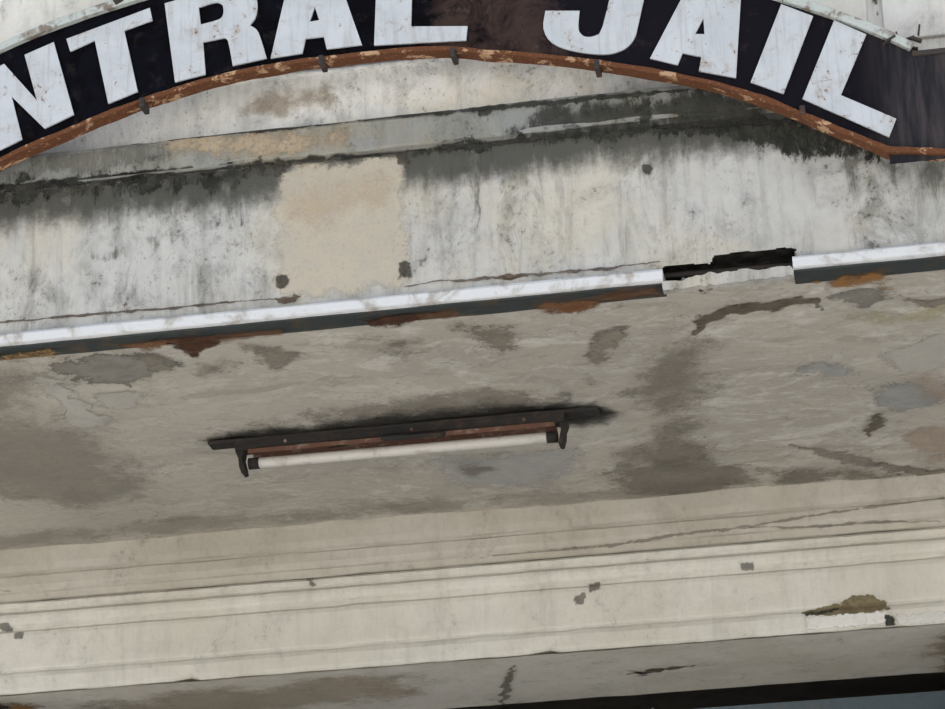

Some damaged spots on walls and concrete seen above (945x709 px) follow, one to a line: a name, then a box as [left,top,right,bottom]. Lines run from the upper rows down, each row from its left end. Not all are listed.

rust [253,86,330,115]
rust [159,122,351,157]
spalling [662,248,795,294]
rust [363,311,456,327]
rust [532,289,660,315]
peeling [692,288,945,335]
rust [119,329,281,358]
leakage [585,326,628,365]
peeling [30,352,182,429]
leakage [604,339,896,496]
peeling [801,594,945,630]
crack [498,665,516,706]